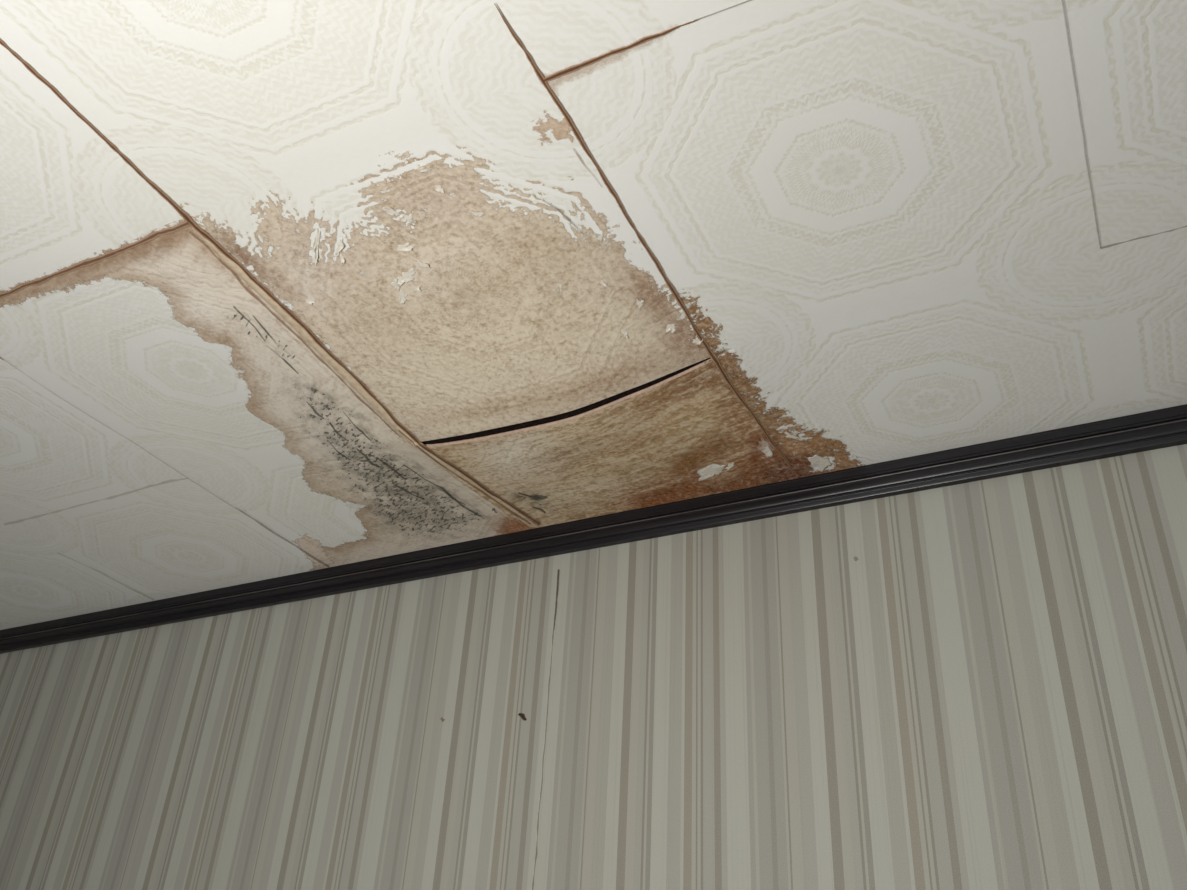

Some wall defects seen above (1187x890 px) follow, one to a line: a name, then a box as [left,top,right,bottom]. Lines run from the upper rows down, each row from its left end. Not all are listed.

crack [0,3,796,527]
leakage [0,147,865,571]